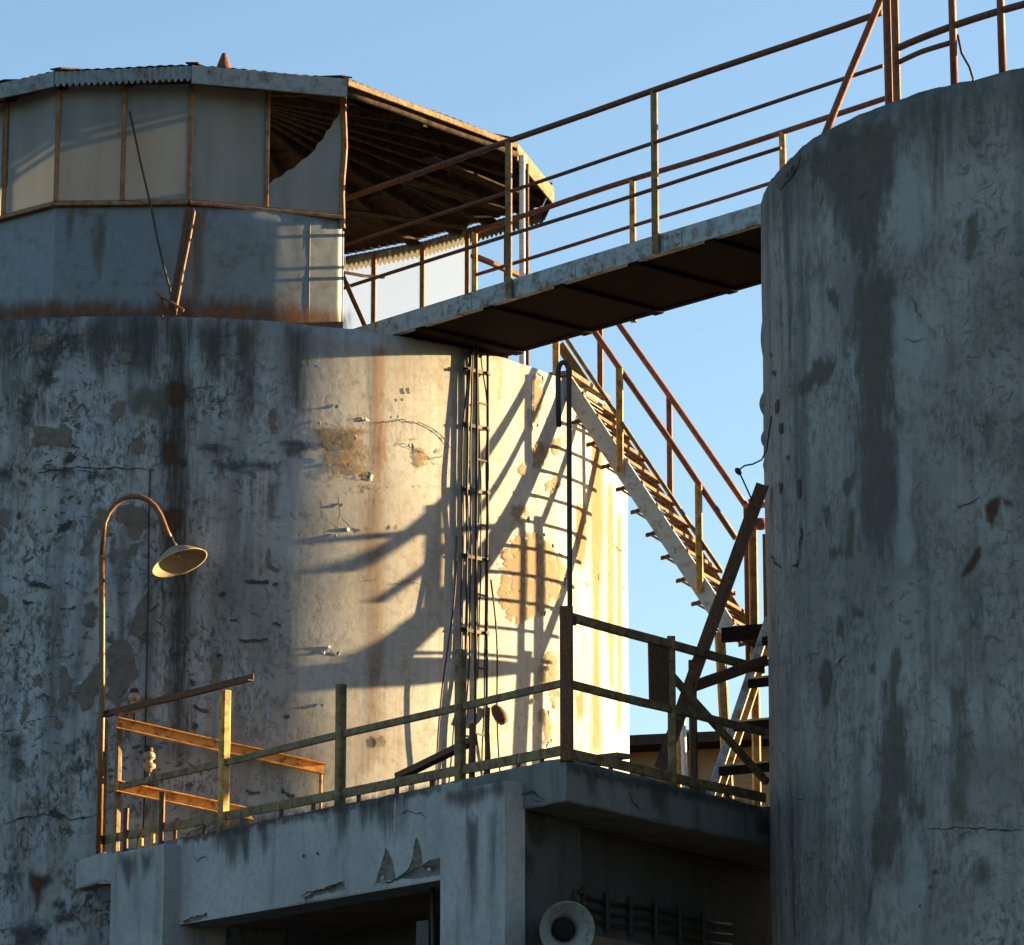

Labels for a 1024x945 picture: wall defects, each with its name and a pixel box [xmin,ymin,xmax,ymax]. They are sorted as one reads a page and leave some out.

corrosion [0,300,347,329]
leakage [36,321,102,385]
crack [34,466,161,475]
leakage [132,323,186,545]
peeling [310,404,394,506]
crack [378,419,452,460]
corrosion [986,498,1011,523]
peeling [496,504,567,627]
leakage [890,649,900,700]
crack [926,824,1021,832]
spalling [377,839,440,882]
spalling [304,883,345,901]